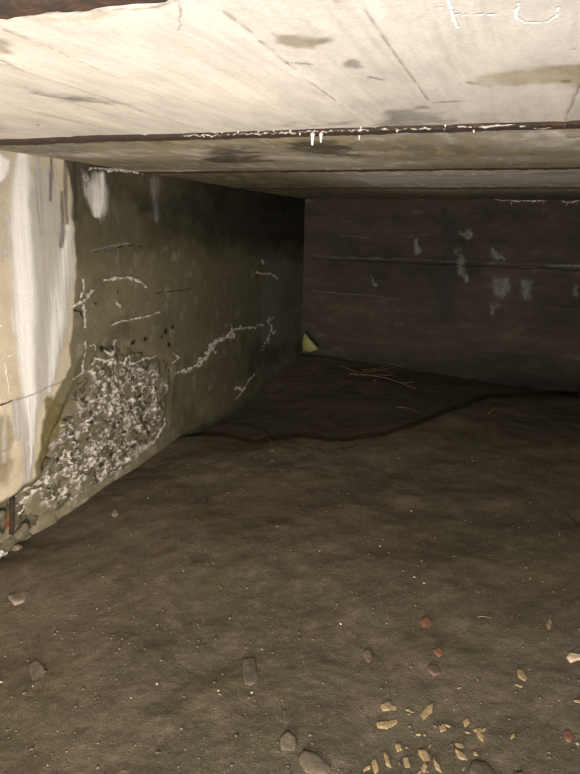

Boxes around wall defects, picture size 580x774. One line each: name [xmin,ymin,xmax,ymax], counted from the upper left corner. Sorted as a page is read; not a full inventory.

water stain [512,66,580,86]
water stain [0,145,144,481]
crack [73,288,263,380]
spalling [0,337,171,559]